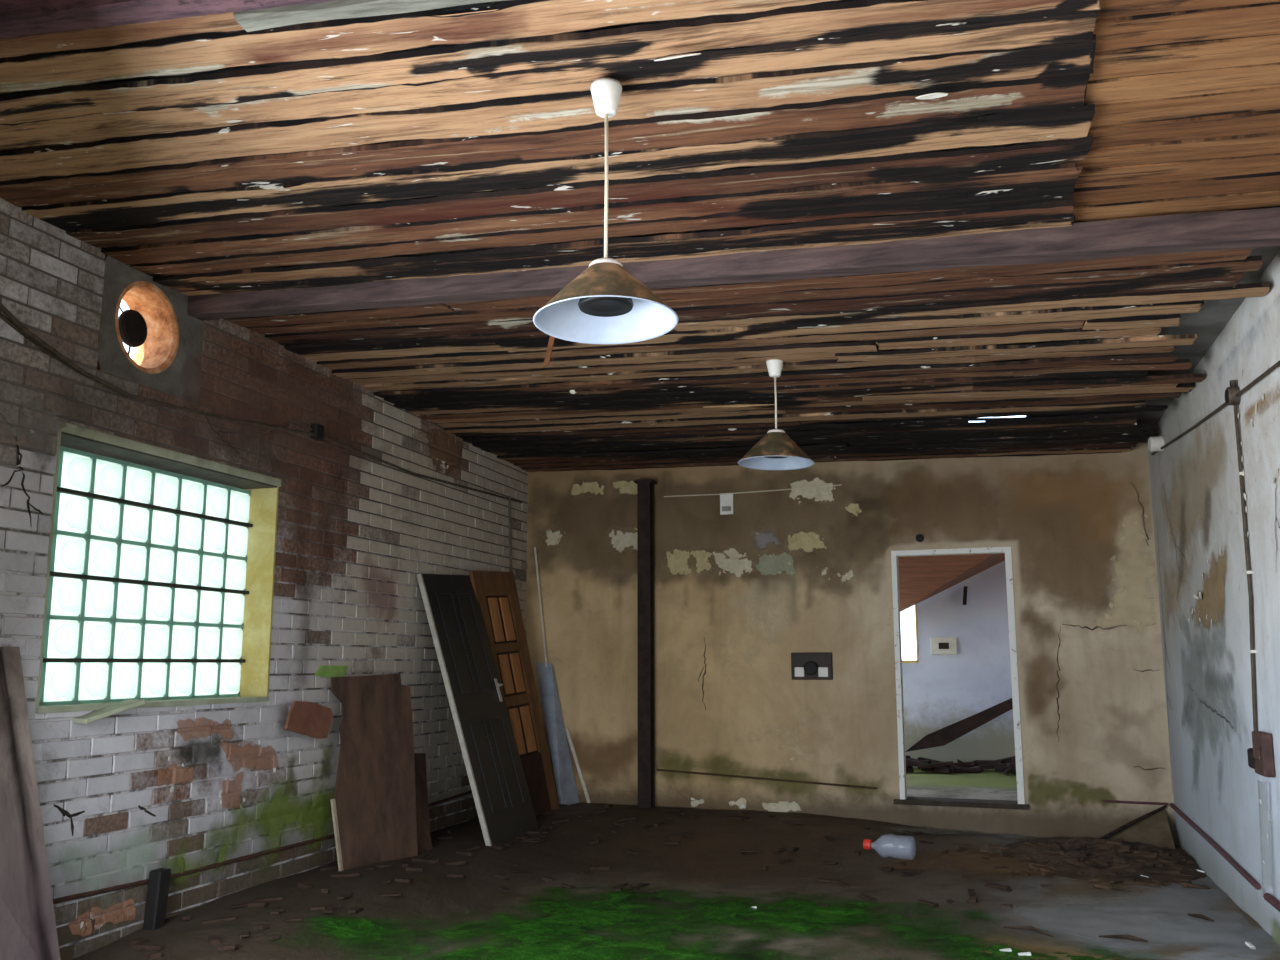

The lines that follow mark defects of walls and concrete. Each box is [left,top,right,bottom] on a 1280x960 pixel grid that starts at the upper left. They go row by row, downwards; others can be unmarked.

peeling [1238,390,1280,428]
crack [0,413,43,527]
peeling [571,480,637,495]
peeling [789,477,862,516]
peeling [545,530,565,546]
peeling [609,528,637,553]
peeling [666,531,826,577]
peeling [822,568,853,582]
flaking render [1188,548,1226,630]
crack [1056,483,1235,780]
peeling [158,756,193,792]
peeling [177,718,278,810]